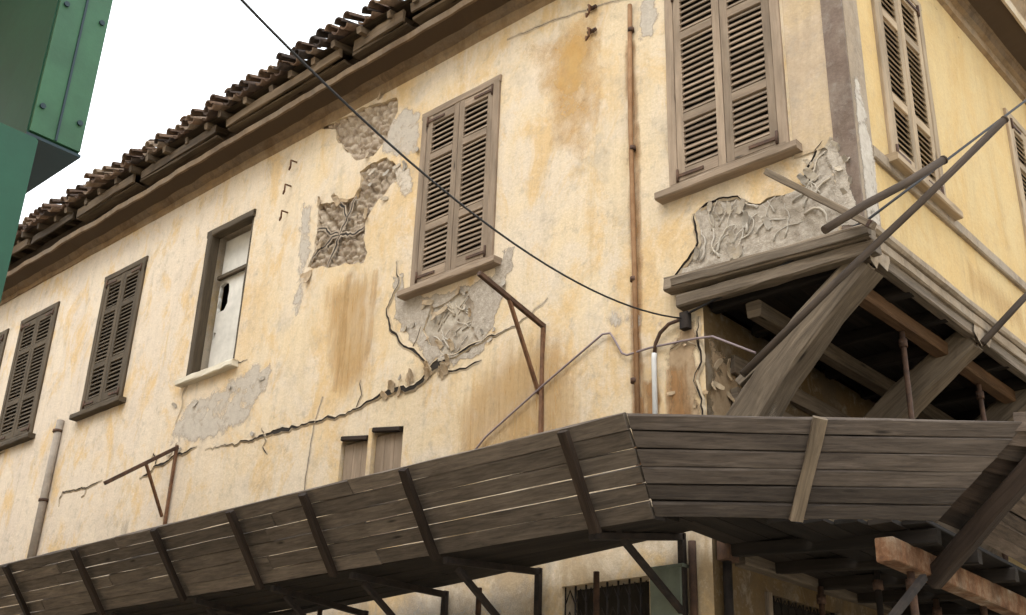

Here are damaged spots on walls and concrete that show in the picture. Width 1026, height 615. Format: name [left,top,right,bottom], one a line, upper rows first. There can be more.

peeling [166,364,272,457]
crack [139,260,548,490]
spalling [293,93,420,315]
peeling [393,246,515,366]
corrosion [630,199,639,239]
peeling [674,78,880,275]